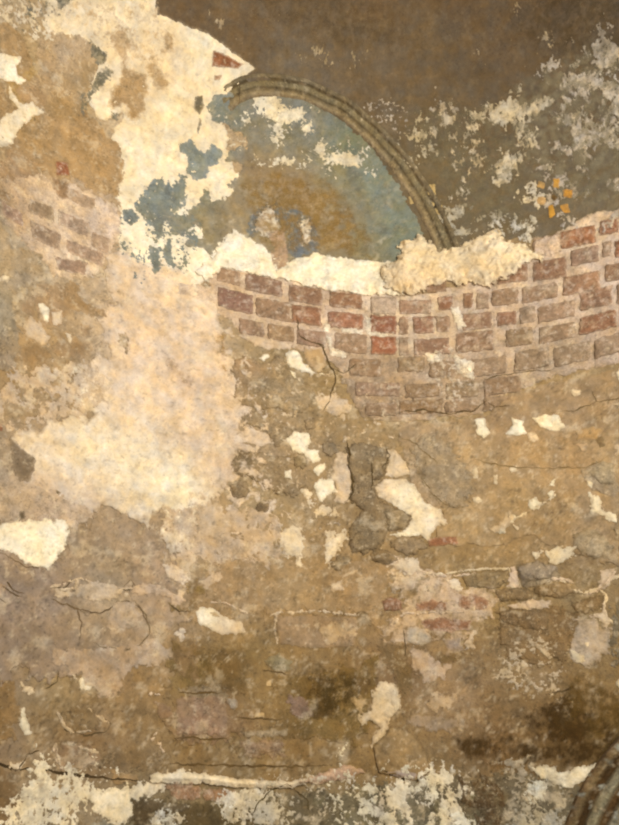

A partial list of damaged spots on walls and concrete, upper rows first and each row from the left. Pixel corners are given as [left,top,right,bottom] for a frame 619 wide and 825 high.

flaking render [0,0,619,646]
crack [296,318,356,409]
crack [395,400,509,415]
crack [345,435,439,504]
crack [473,457,606,469]
crack [53,579,150,651]
spalling [20,681,35,695]
crack [170,736,327,814]
crack [240,715,282,723]
peeling [0,705,596,825]
leakage [458,739,489,756]
leakage [517,680,619,763]